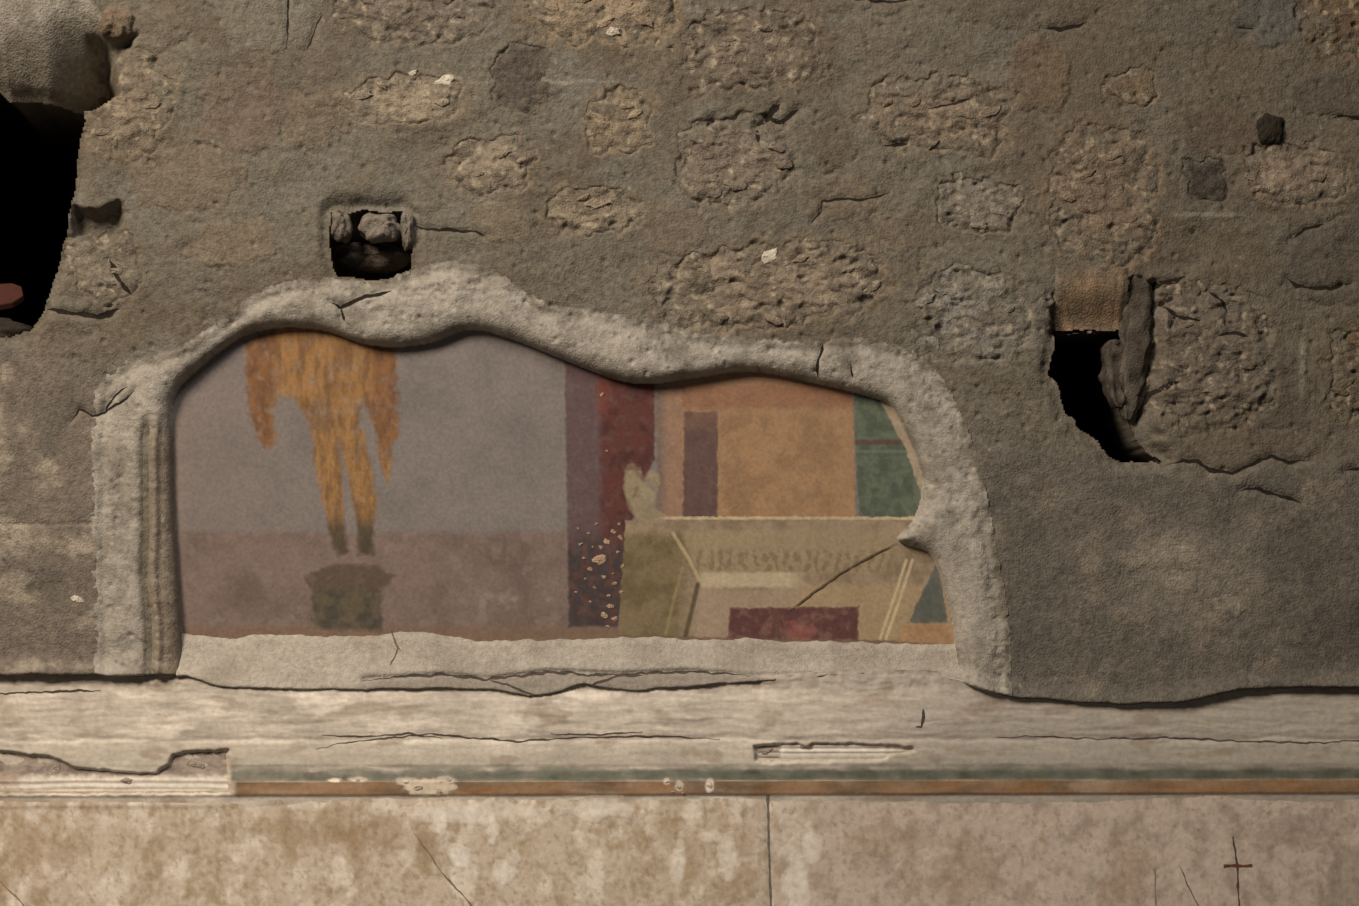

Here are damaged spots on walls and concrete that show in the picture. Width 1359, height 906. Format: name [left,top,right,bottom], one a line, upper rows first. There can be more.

crack [286,0,322,50]
crack [857,0,907,8]
spalling [0,47,177,328]
spalling [1048,276,1279,464]
crack [71,387,134,421]
crack [788,543,897,611]
crack [0,688,100,696]
crack [363,630,750,696]
crack [317,731,720,749]
crack [414,833,473,906]